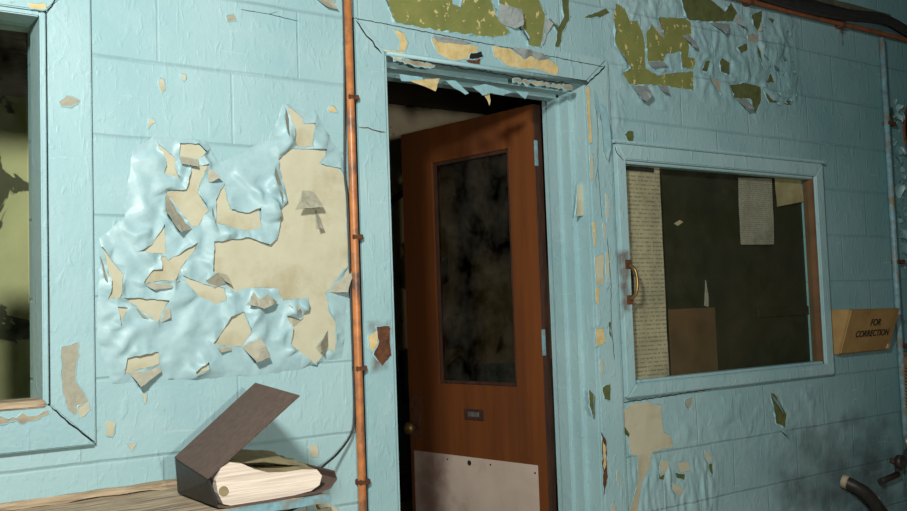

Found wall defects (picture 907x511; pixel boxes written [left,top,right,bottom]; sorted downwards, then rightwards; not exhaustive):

peeling [319,0,338,9]
peeling [382,0,573,106]
peeling [584,0,798,113]
peeling [574,86,610,305]
peeling [890,98,907,272]
peeling [299,491,339,511]
peeling [397,348,409,406]
peeling [624,400,690,511]
peeling [770,392,788,436]